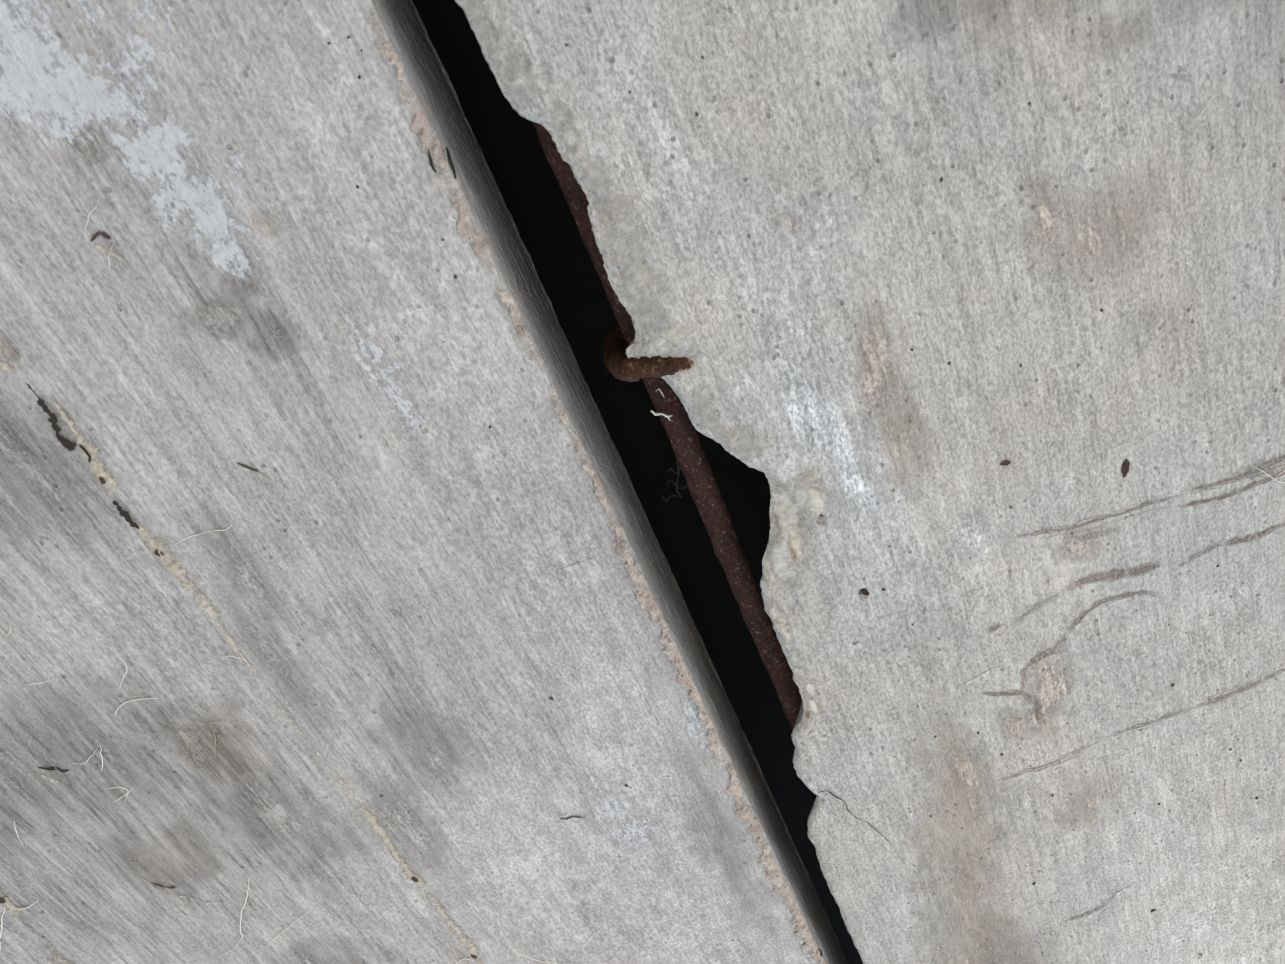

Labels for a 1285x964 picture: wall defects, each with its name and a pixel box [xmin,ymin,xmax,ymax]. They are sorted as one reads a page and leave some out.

spalling [457,0,531,101]
leakage [0,0,264,279]
spalling [368,13,492,273]
spalling [497,290,543,366]
spalling [631,307,702,381]
spalling [550,384,829,964]
crack [818,790,888,841]